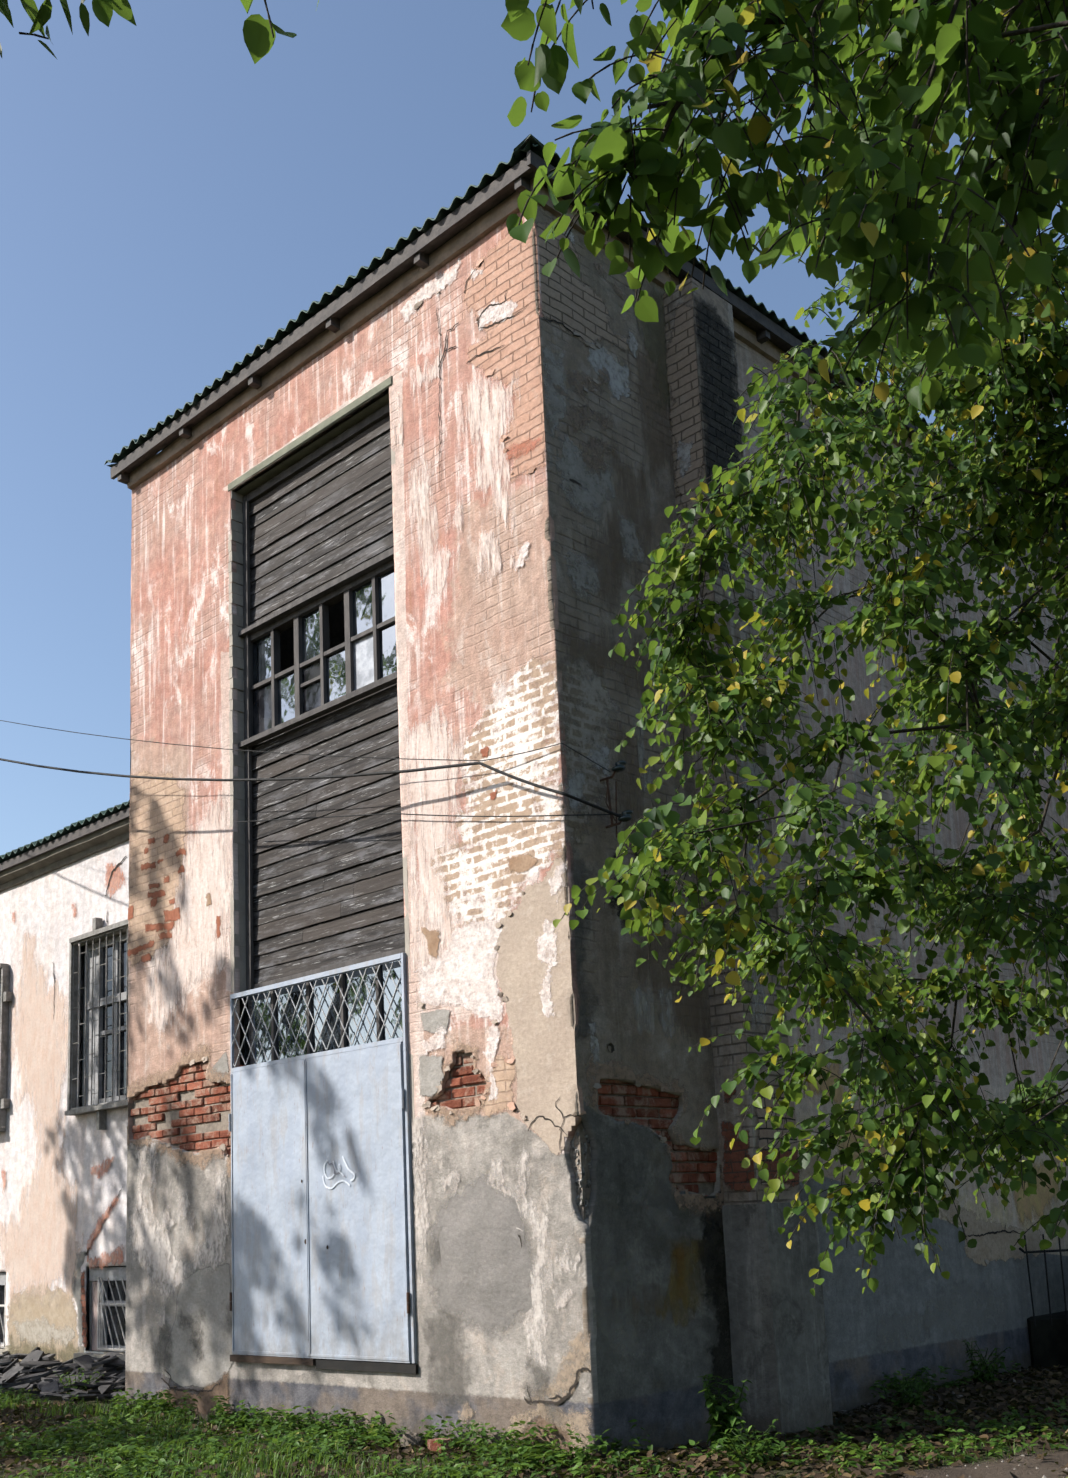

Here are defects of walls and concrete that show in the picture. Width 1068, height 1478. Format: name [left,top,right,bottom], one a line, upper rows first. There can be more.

peeling [392,354,444,445]
peeling [400,222,638,597]
peeling [105,770,233,1034]
peeling [402,656,884,1224]
peeling [0,913,124,1347]
spalling [127,1044,246,1177]
leakage [412,1113,460,1278]
leakage [489,1151,581,1398]
crack [528,1097,578,1148]
peeling [895,1188,1042,1266]
leakage [426,1314,466,1404]
crack [524,1367,591,1405]